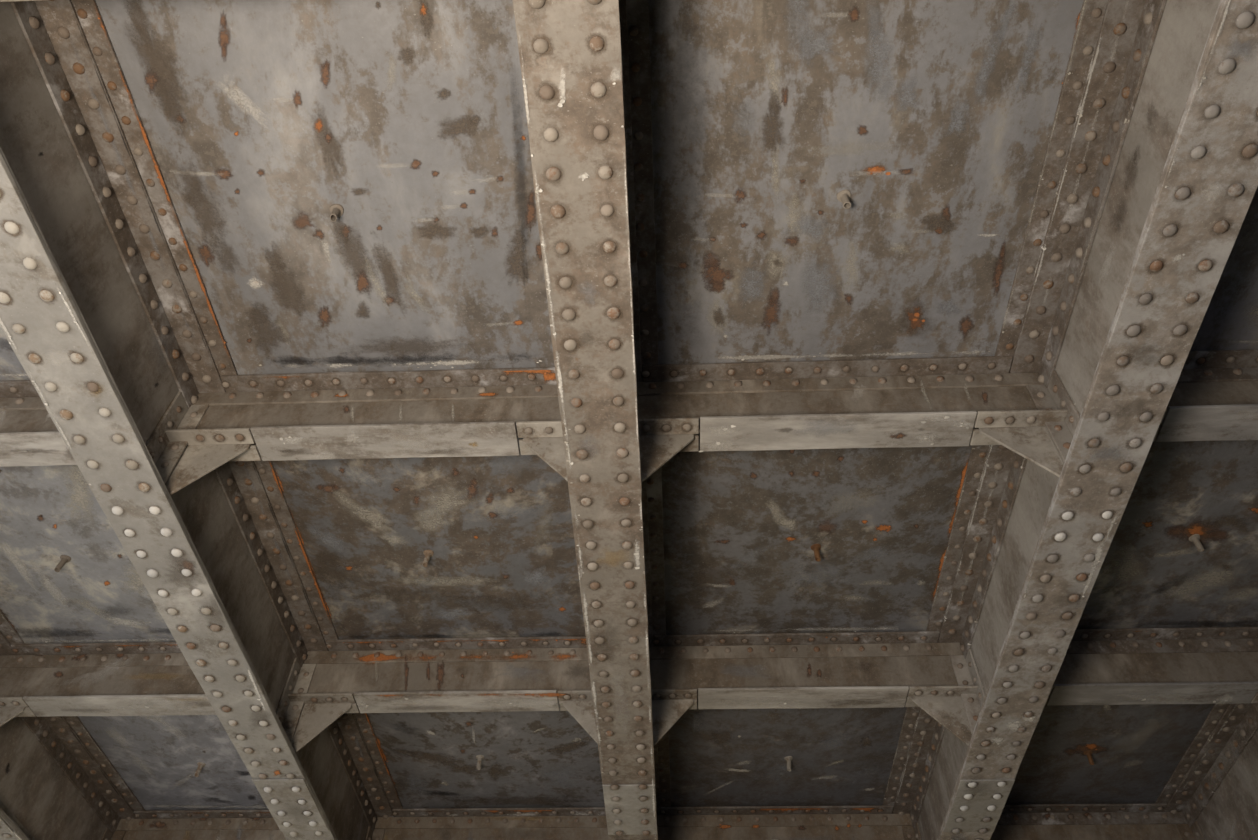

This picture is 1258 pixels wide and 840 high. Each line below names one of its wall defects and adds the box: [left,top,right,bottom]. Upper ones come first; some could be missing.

rust [219,14,230,57]
rust [321,61,330,86]
rust [863,166,912,175]
rust [294,213,400,305]
rust [503,370,556,381]
rust [1167,508,1258,544]